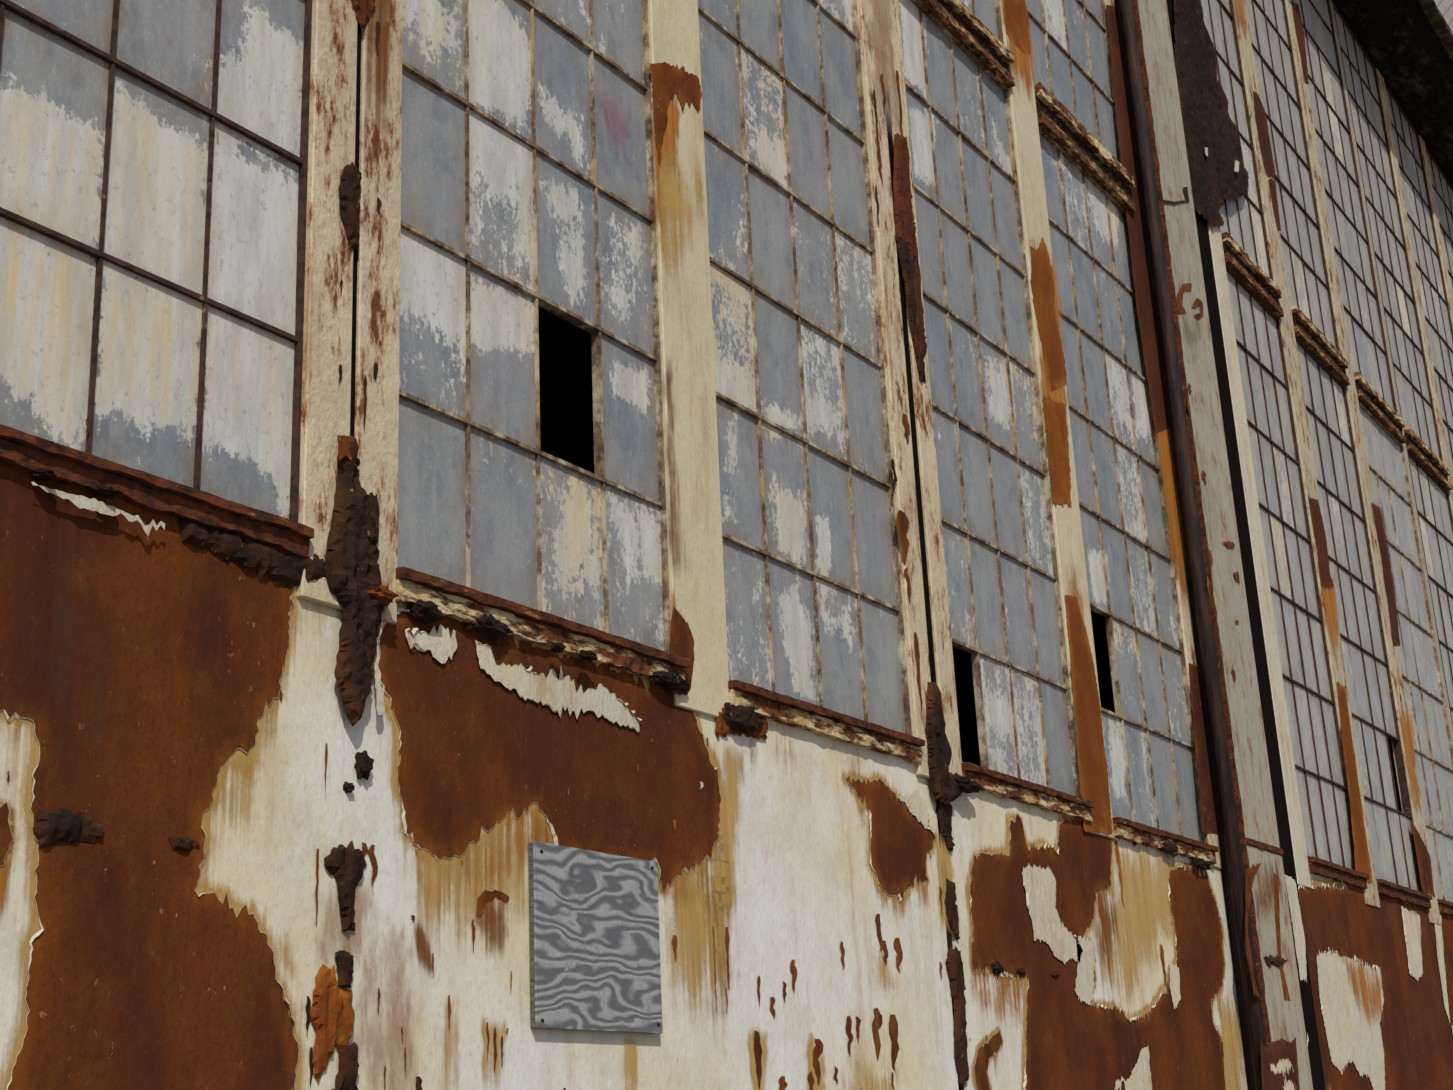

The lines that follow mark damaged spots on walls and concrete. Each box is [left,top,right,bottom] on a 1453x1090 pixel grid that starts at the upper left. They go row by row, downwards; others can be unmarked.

rust [1253,91,1281,232]
rust [1030,237,1072,507]
rust [1308,496,1339,658]
rust [1371,502,1400,646]
rust [0,461,302,1090]
rust [371,597,742,1014]
rust [748,1030,788,1090]
rust [757,960,797,1019]
rust [807,1008,899,1090]
rust [842,771,936,989]
rust [965,579,1242,1090]
rust [1245,681,1453,1090]